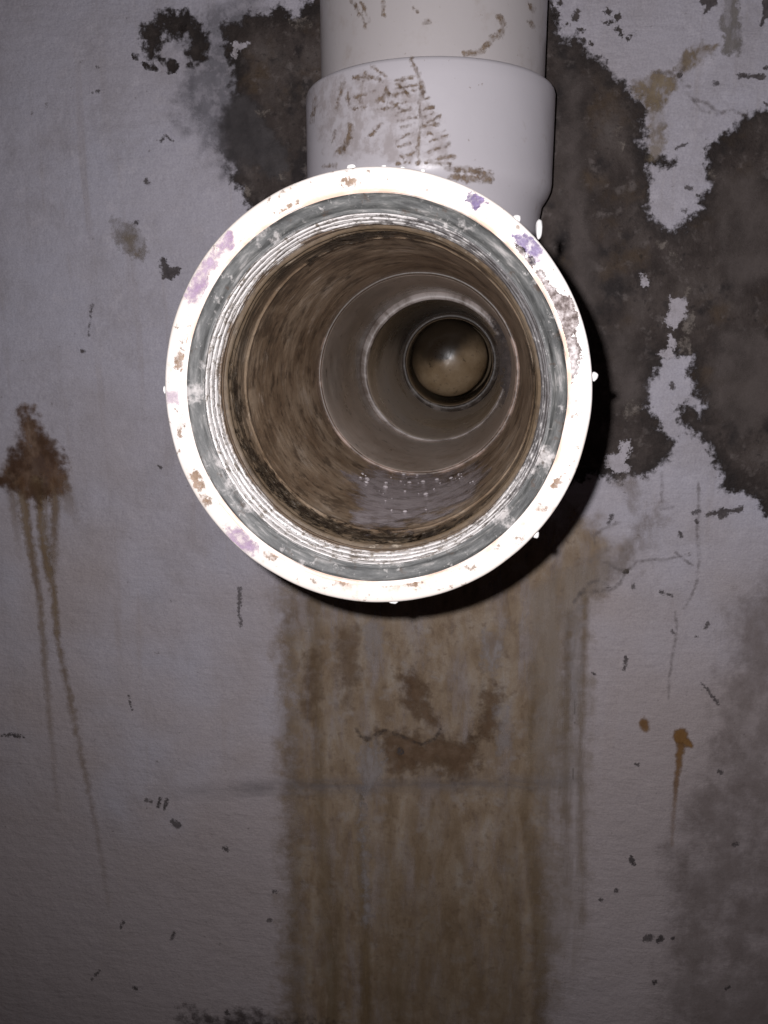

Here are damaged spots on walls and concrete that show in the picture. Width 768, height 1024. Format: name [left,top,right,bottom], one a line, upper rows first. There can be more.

spalling [489,314,511,404]
spalling [539,0,768,524]
rust [0,406,67,652]
damp [279,509,607,1024]
rust [674,729,693,790]